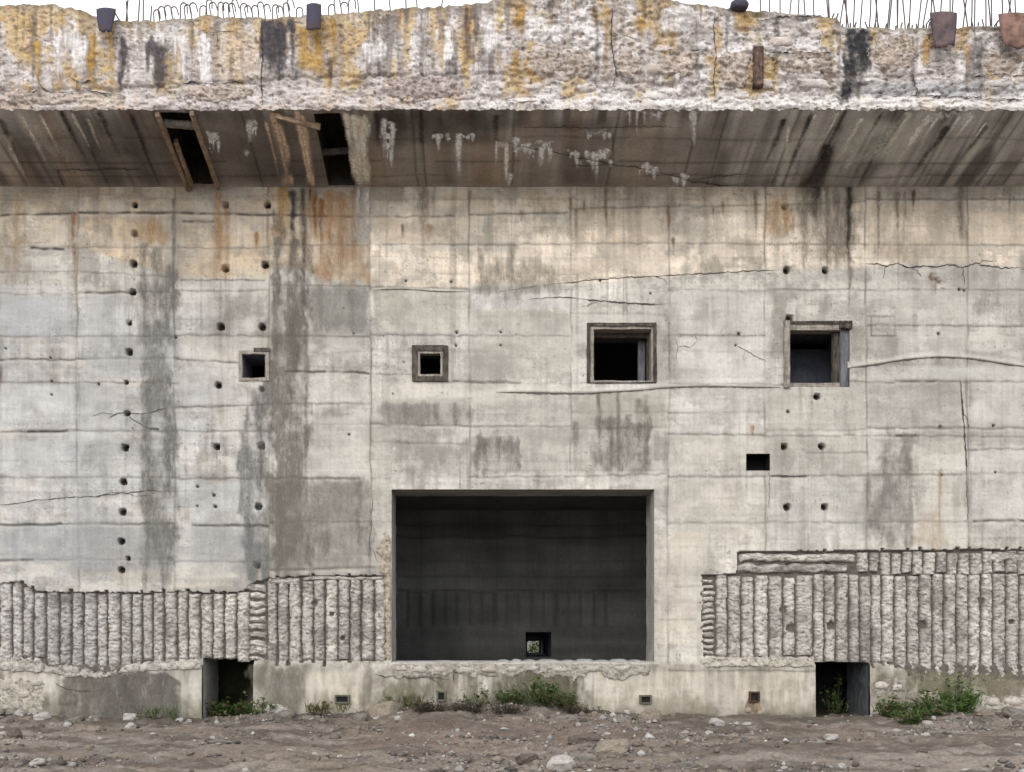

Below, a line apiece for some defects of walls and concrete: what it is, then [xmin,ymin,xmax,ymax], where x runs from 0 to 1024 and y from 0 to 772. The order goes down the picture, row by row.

spalling [155,84,271,191]
hole [274,112,355,185]
damp [494,115,552,183]
efflorescence [570,132,613,173]
damp [821,28,882,169]
crack [508,269,785,306]
crack [865,260,1024,285]
damp [237,111,359,584]
crack [1,490,176,505]
damp [125,245,180,589]
crack [960,380,969,517]
spalling [0,532,650,711]